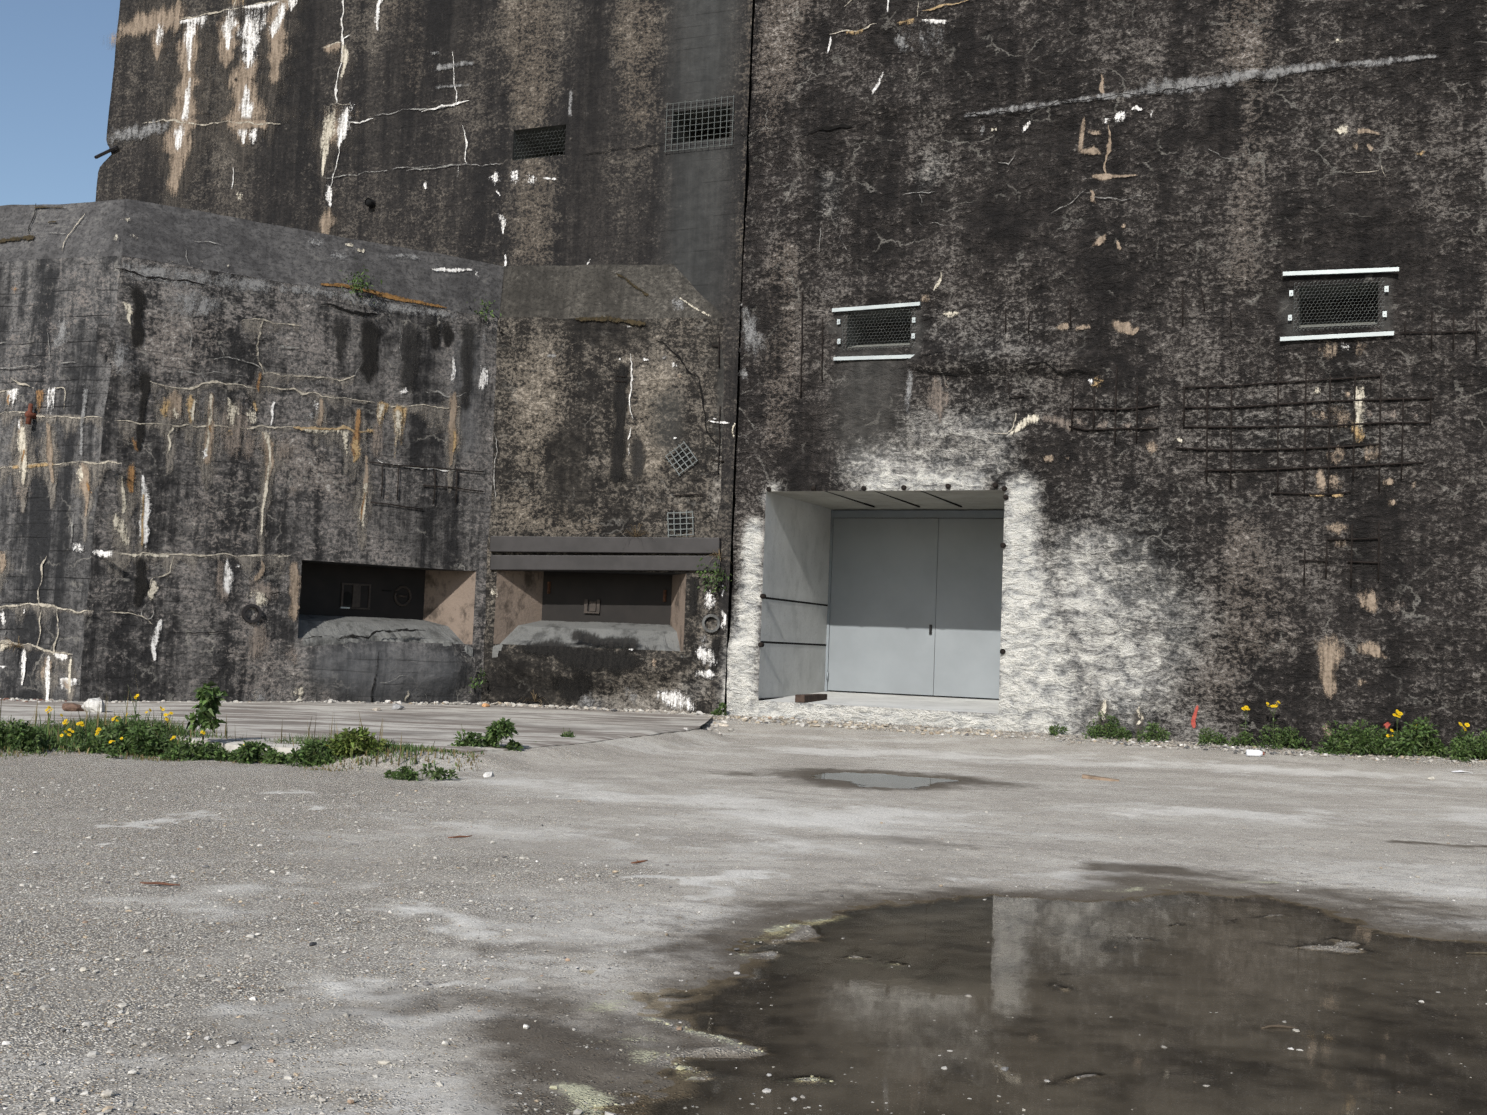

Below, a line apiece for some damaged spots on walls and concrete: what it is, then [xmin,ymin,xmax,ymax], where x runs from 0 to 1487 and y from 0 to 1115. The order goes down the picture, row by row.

efflorescence [111,0,302,208]
efflorescence [315,41,353,235]
crack [330,0,519,187]
rust [12,379,66,407]
damp [131,284,145,347]
crack [0,318,464,481]
damp [401,321,488,493]
spalling [988,367,1160,452]
spalling [1176,343,1434,506]
rust [0,554,9,590]
crack [0,520,291,668]
spalling [1299,521,1399,613]